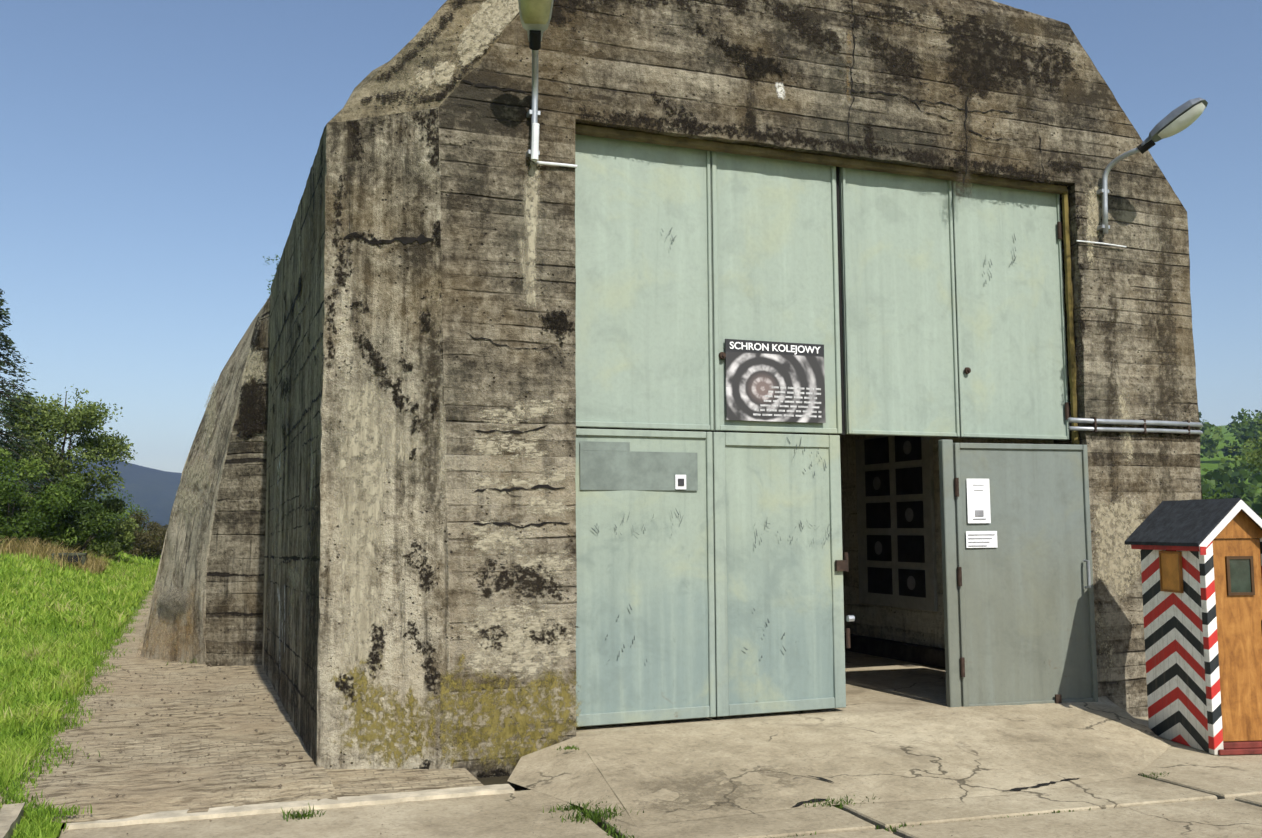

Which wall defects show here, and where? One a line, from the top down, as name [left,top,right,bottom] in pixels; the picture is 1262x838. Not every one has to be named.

crack [344,232,435,248]
spalling [237,317,276,438]
water stain [466,398,574,581]
water stain [459,601,572,679]
crack [792,775,834,807]
crack [1004,778,1079,791]